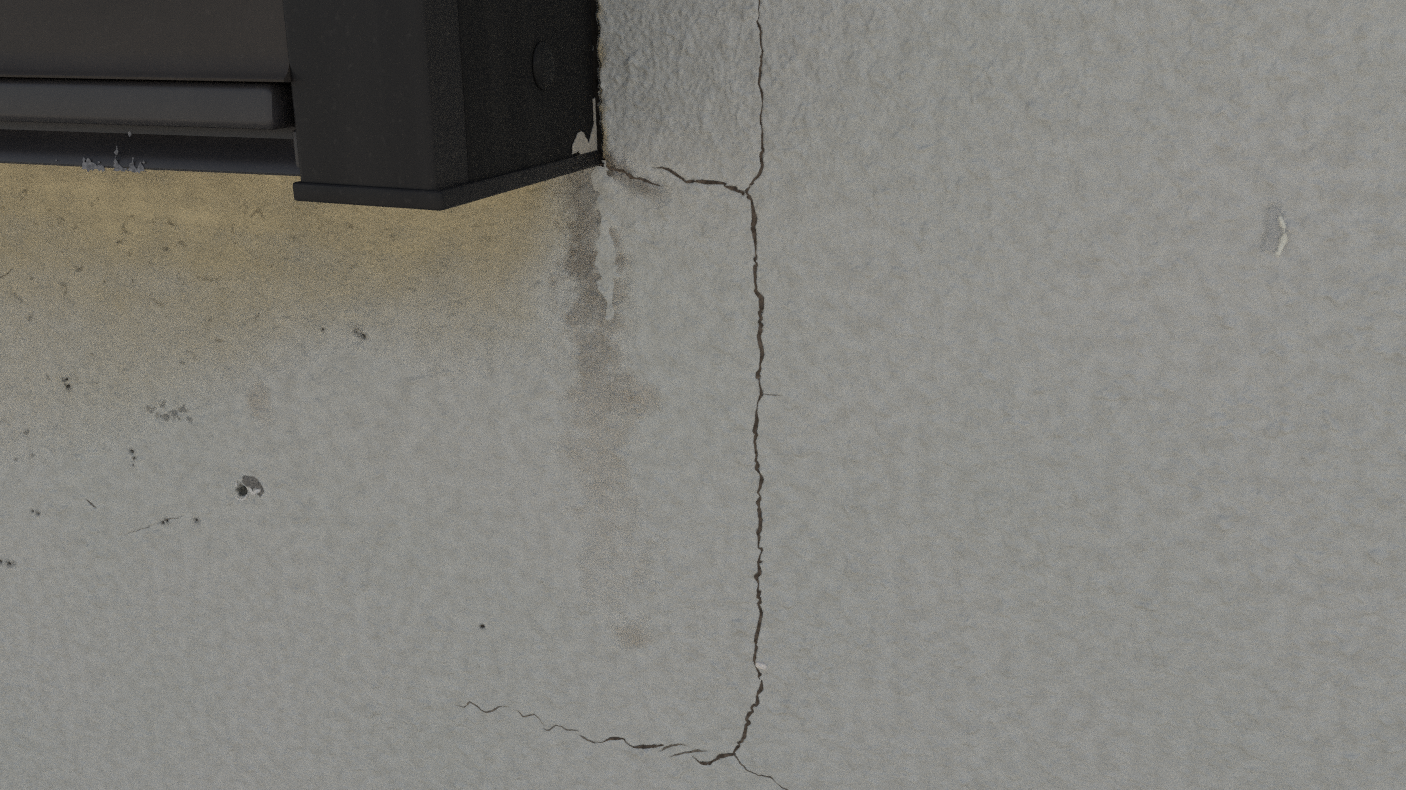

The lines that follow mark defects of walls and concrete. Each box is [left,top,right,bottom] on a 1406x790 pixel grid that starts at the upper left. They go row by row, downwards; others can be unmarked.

crack [456,0,788,790]